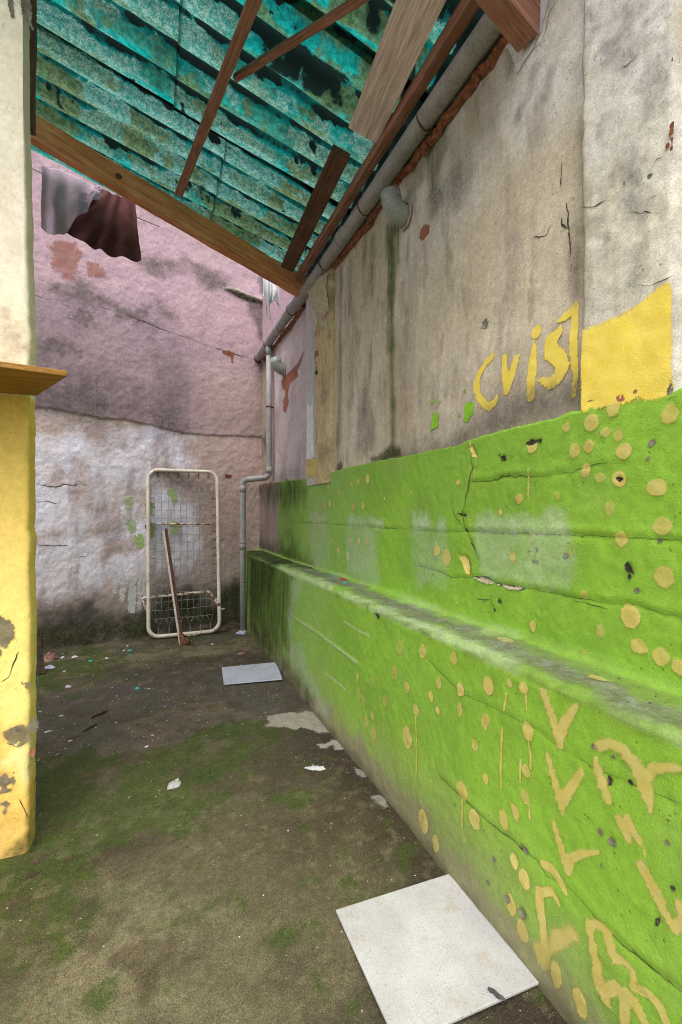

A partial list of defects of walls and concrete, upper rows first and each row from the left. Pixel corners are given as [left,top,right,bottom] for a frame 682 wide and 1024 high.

crack [534,163,655,272]
spalling [281,350,318,413]
crack [299,449,677,557]
spalling [460,555,522,612]
spalling [0,615,15,656]
spalling [3,717,40,761]